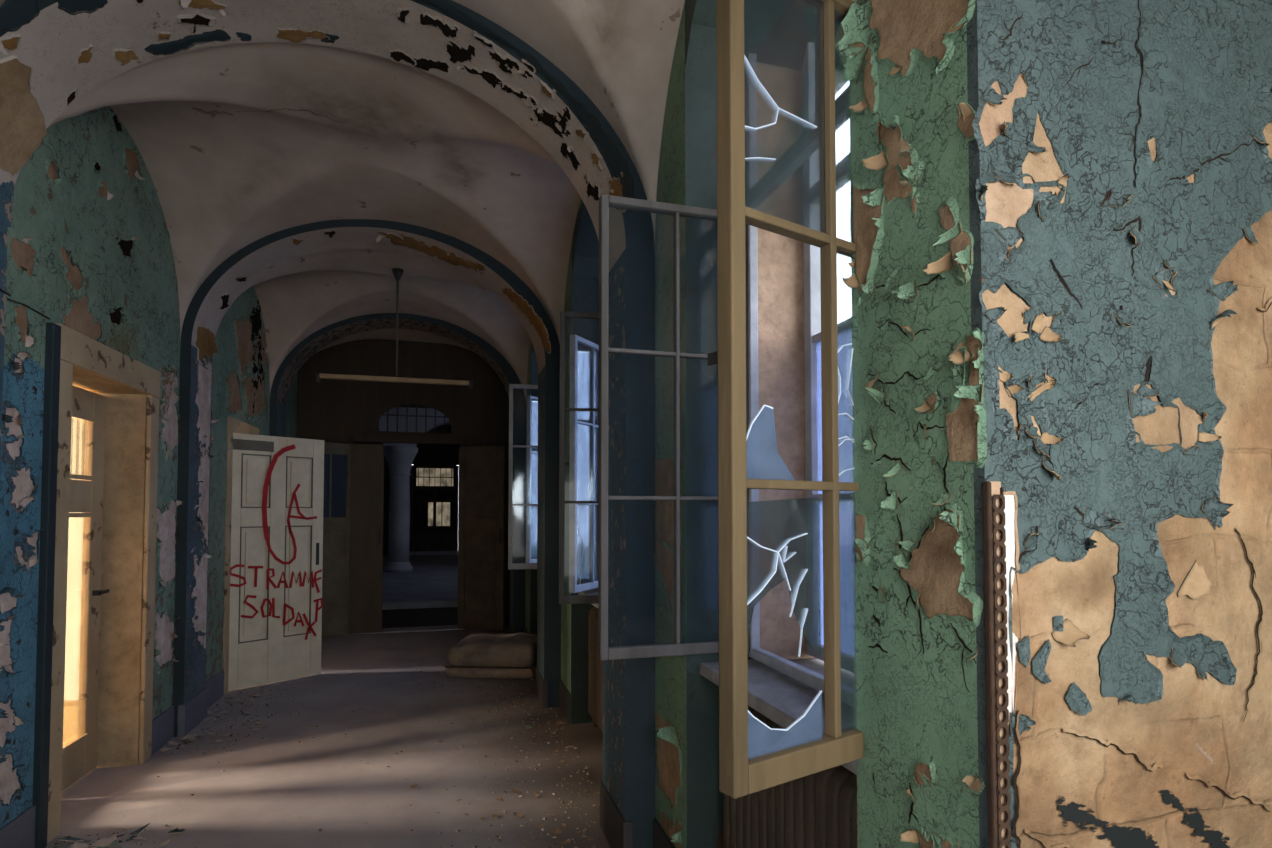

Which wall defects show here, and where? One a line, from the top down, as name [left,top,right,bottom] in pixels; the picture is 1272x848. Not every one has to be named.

flaking render [0,33,62,186]
peeling [388,7,626,213]
peeling [837,0,976,296]
peeling [914,71,1071,468]
crack [1258,298,1272,312]
peeling [0,587,25,673]
peeling [1,400,41,514]
peeling [852,512,871,568]
flaking render [897,502,983,627]
flaking render [1002,204,1272,848]
crack [1236,527,1265,721]
peeling [0,697,26,807]